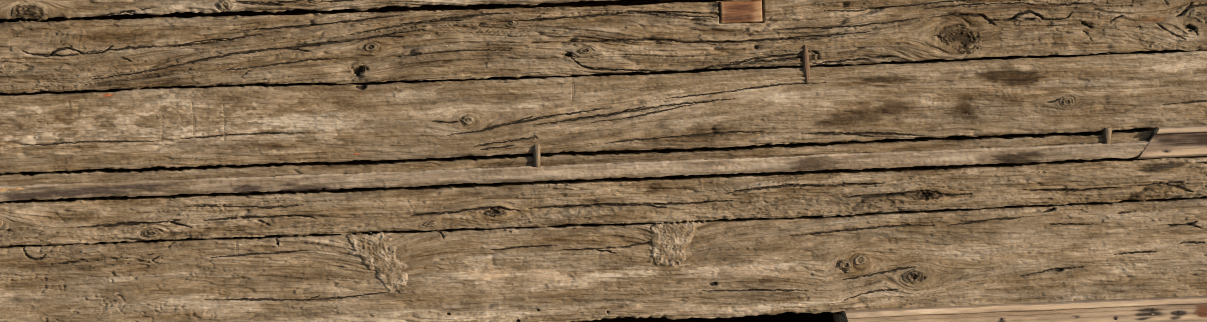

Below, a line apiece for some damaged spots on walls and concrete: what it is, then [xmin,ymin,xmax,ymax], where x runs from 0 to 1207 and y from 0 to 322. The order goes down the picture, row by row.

crack [3,0,1207,150]